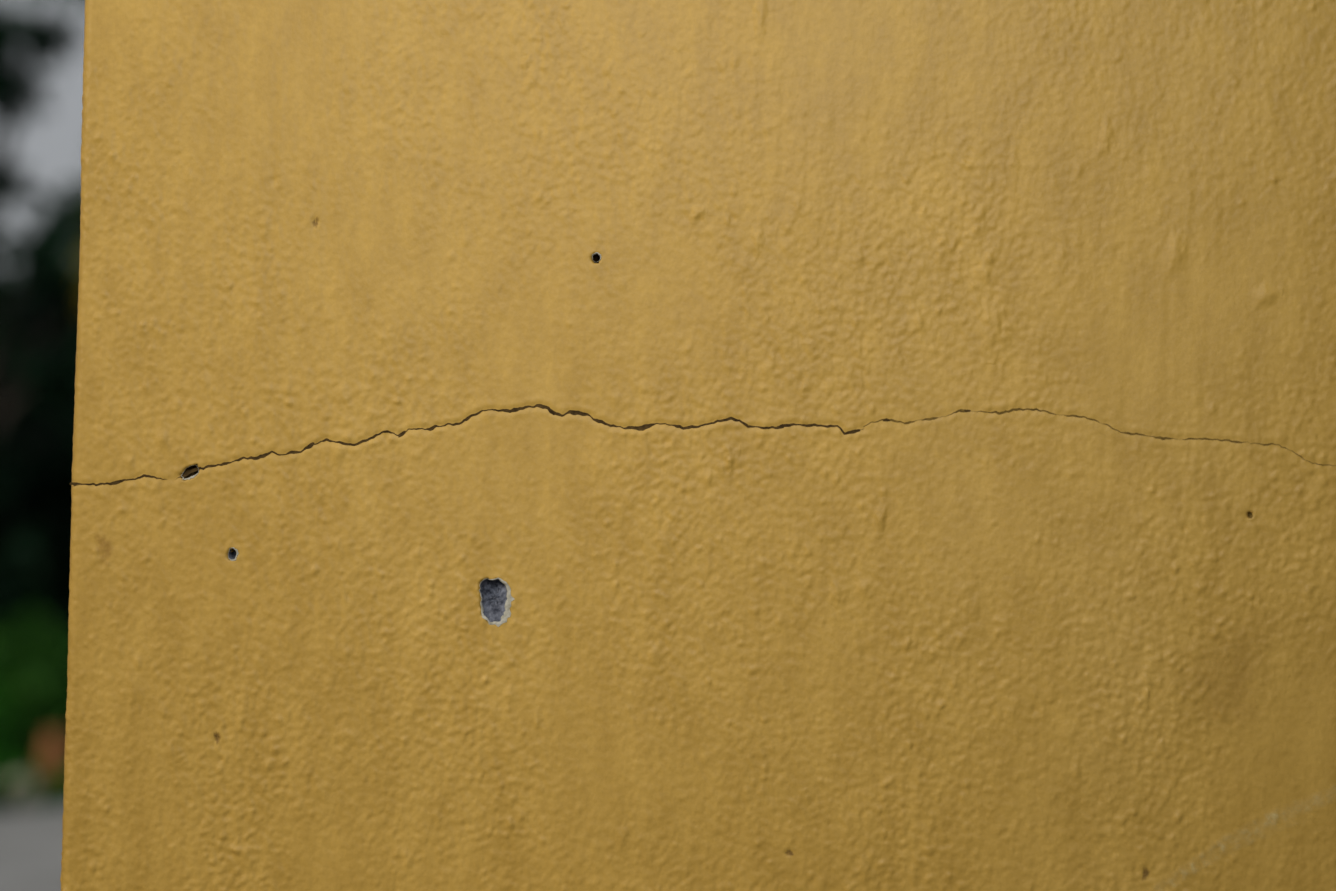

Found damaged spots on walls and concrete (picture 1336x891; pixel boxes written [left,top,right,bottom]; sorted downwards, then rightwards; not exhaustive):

crack [70,404,1336,486]
spalling [479,578,514,627]